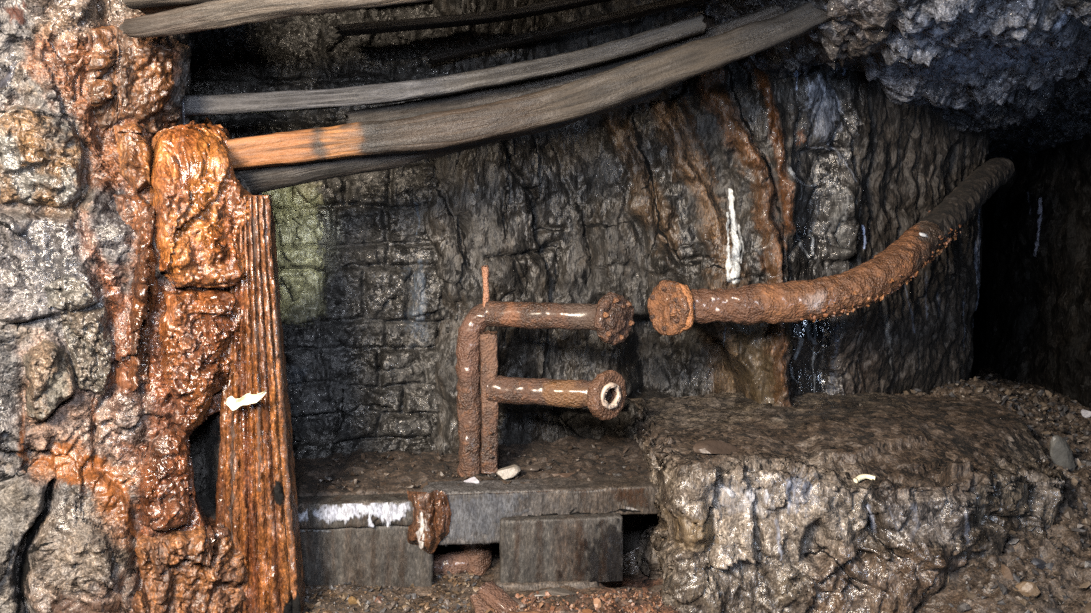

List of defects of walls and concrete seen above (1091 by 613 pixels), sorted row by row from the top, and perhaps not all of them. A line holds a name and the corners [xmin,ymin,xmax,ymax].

rust [755,67,793,227]
water stain [726,189,743,284]
rust [109,367,131,389]
water stain [252,217,262,491]
rust [33,406,142,538]
water stain [287,502,410,532]
rust [407,490,576,554]